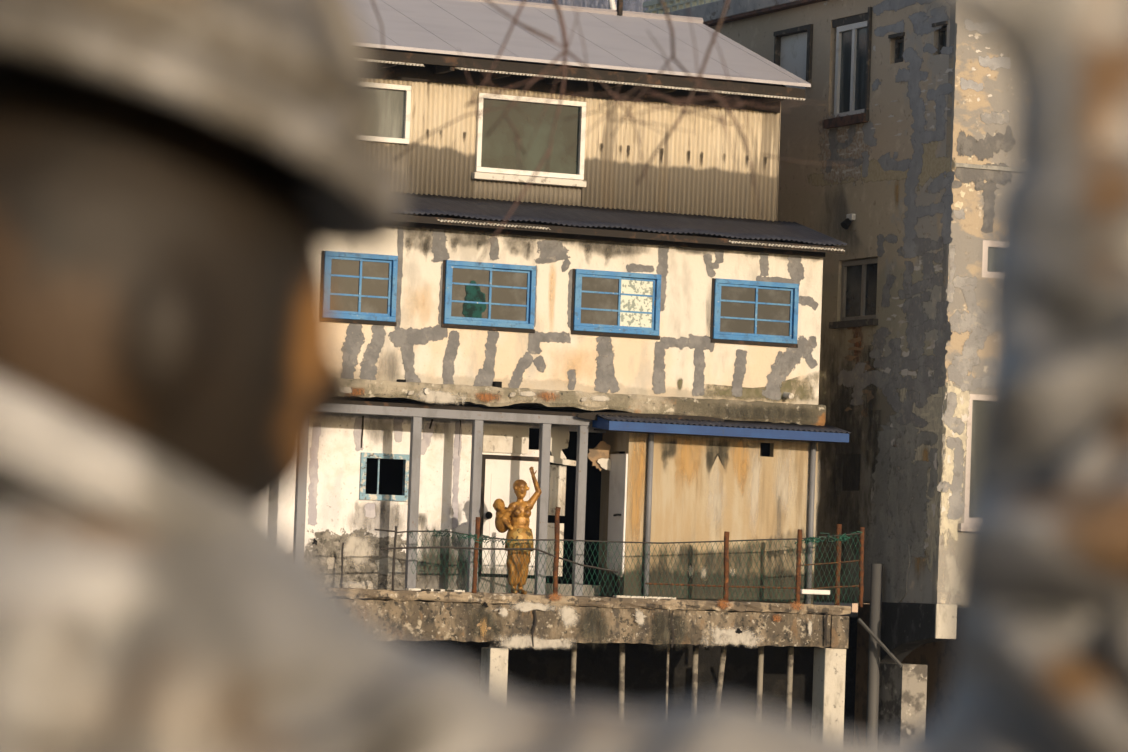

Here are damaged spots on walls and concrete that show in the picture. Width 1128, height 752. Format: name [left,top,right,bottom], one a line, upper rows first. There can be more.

peeling [917,68,973,191]
damp [662,440,676,461]
damp [707,439,728,469]
peeling [882,297,970,573]
spalling [305,528,427,589]
damp [658,540,794,585]
damp [472,606,497,638]